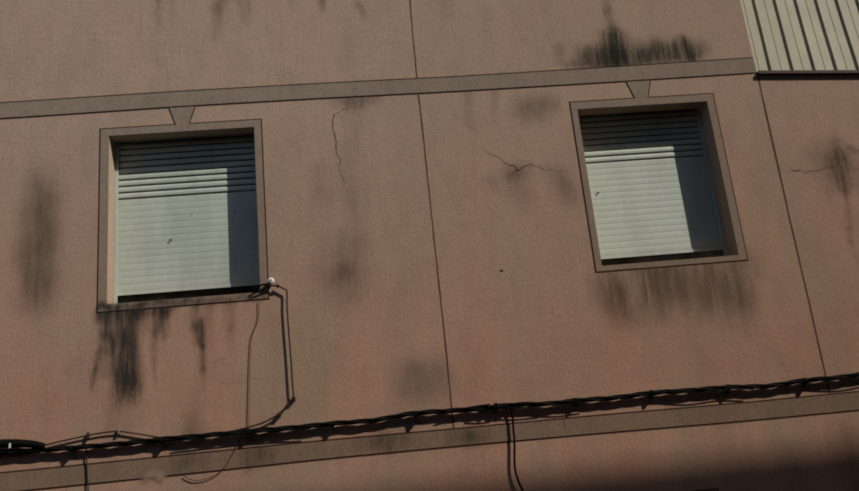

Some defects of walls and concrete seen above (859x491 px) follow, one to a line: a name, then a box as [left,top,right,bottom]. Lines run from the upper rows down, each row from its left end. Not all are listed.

water stain [584,31,699,68]
water stain [98,300,168,399]